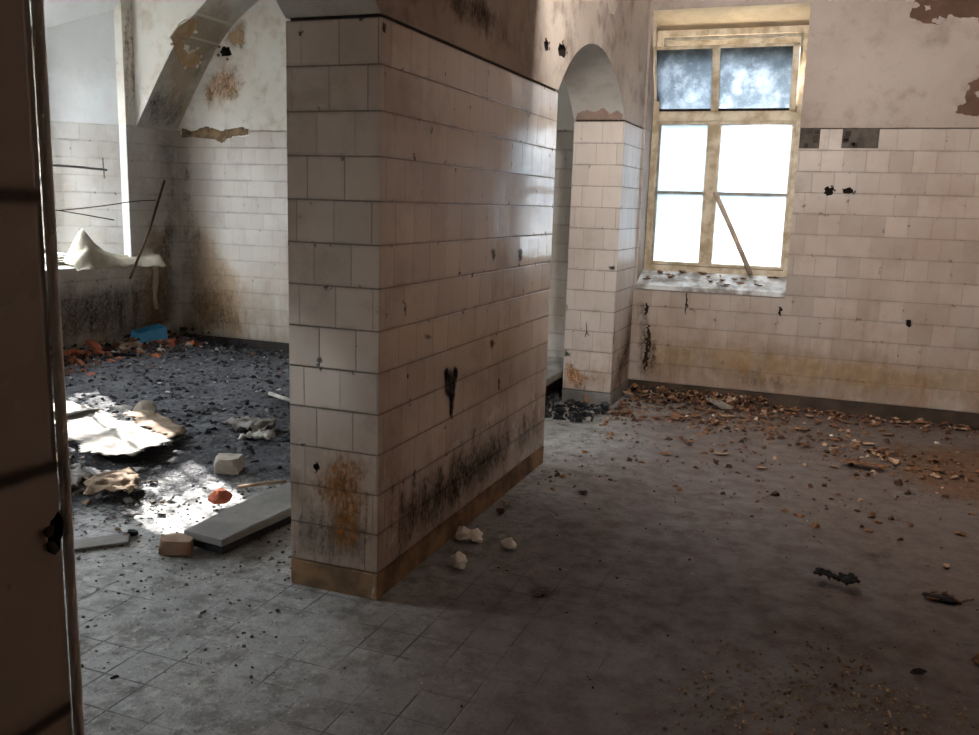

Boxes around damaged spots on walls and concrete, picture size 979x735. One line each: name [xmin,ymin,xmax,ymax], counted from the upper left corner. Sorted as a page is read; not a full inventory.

peeling [910,0,979,25]
peeling [170,17,203,70]
spalling [217,45,232,60]
peeling [180,126,250,143]
peeling [576,108,623,120]
peeling [950,75,979,118]
damp [445,368,458,419]
rust [318,457,368,547]